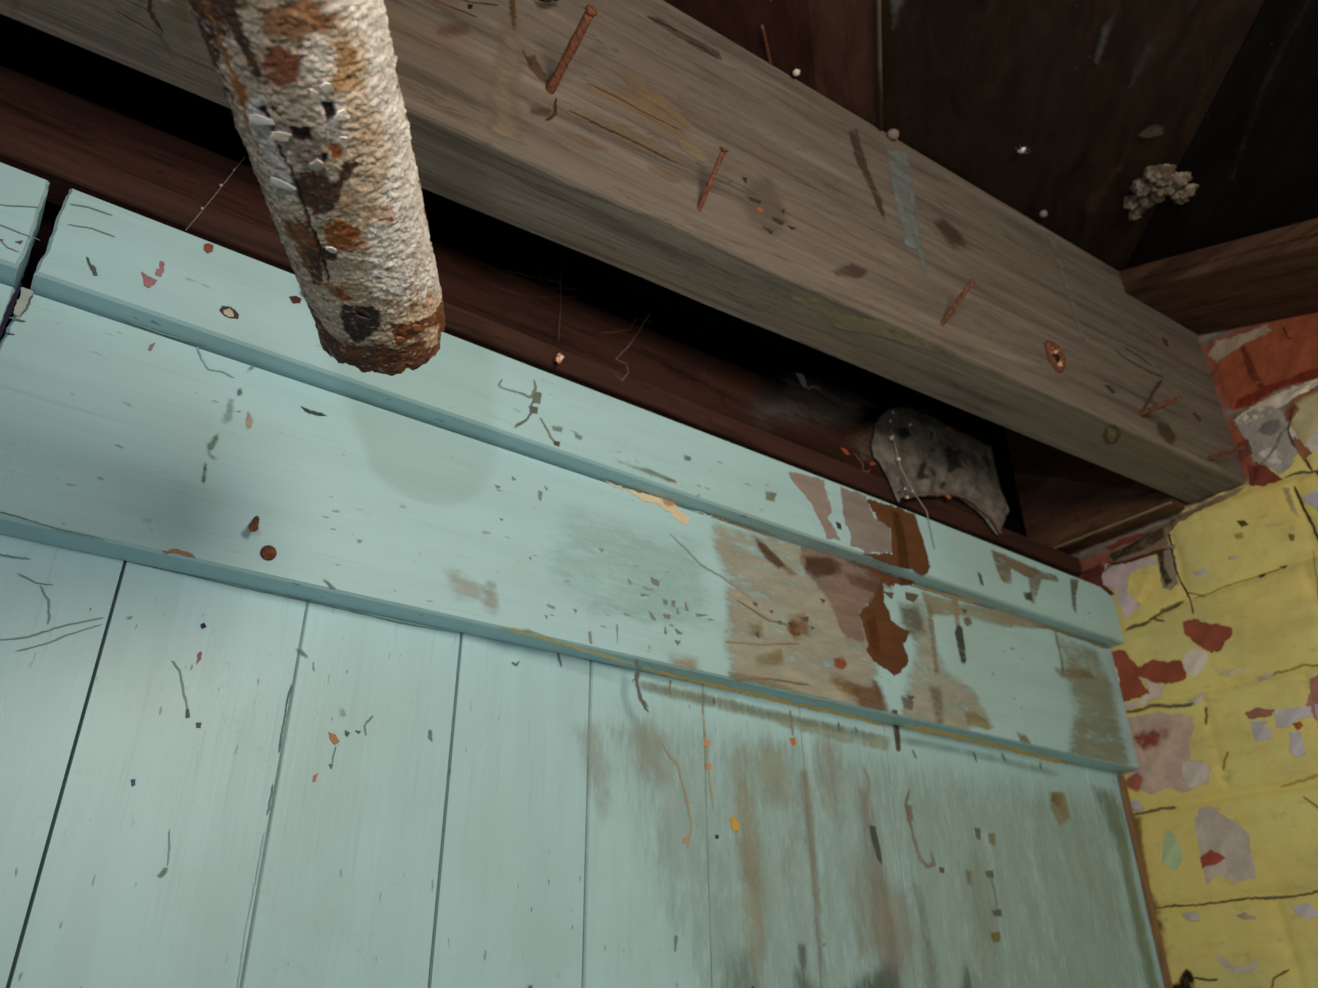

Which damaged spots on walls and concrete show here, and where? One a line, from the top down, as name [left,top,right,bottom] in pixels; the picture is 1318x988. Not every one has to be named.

crack [0,283,34,337]
water stain [670,533,814,690]
water stain [806,558,835,576]
water stain [632,577,1049,903]
peeling [789,471,893,641]
spalling [992,315,1318,619]
peeling [1112,619,1233,812]
crack [1033,423,1318,677]
crack [1126,664,1318,725]
water stain [855,768,934,988]
peeling [1195,805,1256,886]
crack [1156,890,1318,909]